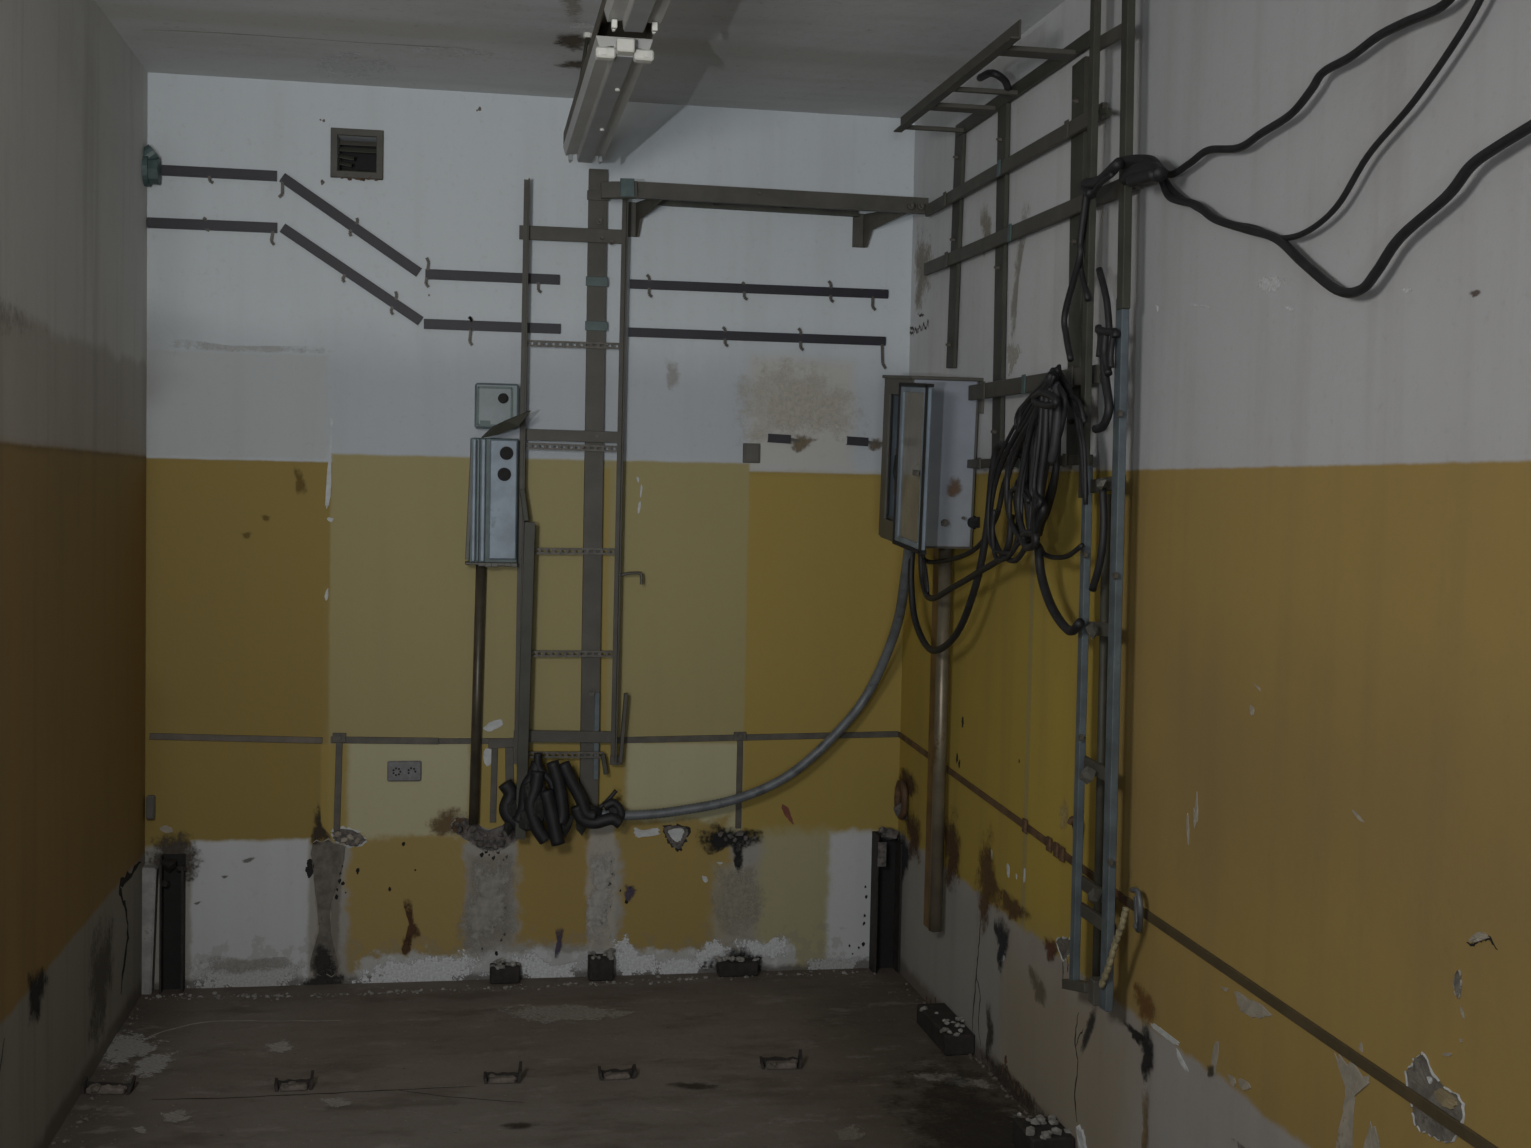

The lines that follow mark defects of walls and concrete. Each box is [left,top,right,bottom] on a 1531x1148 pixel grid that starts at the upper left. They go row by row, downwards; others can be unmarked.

corrosion [944,812,960,887]
corrosion [978,848,1028,932]
corrosion [402,903,419,955]
damp [613,933,789,976]
damp [807,956,868,970]
damp [1125,1024,1143,1045]
peeling [1335,1041,1380,1148]
spalling [1404,1038,1465,1144]